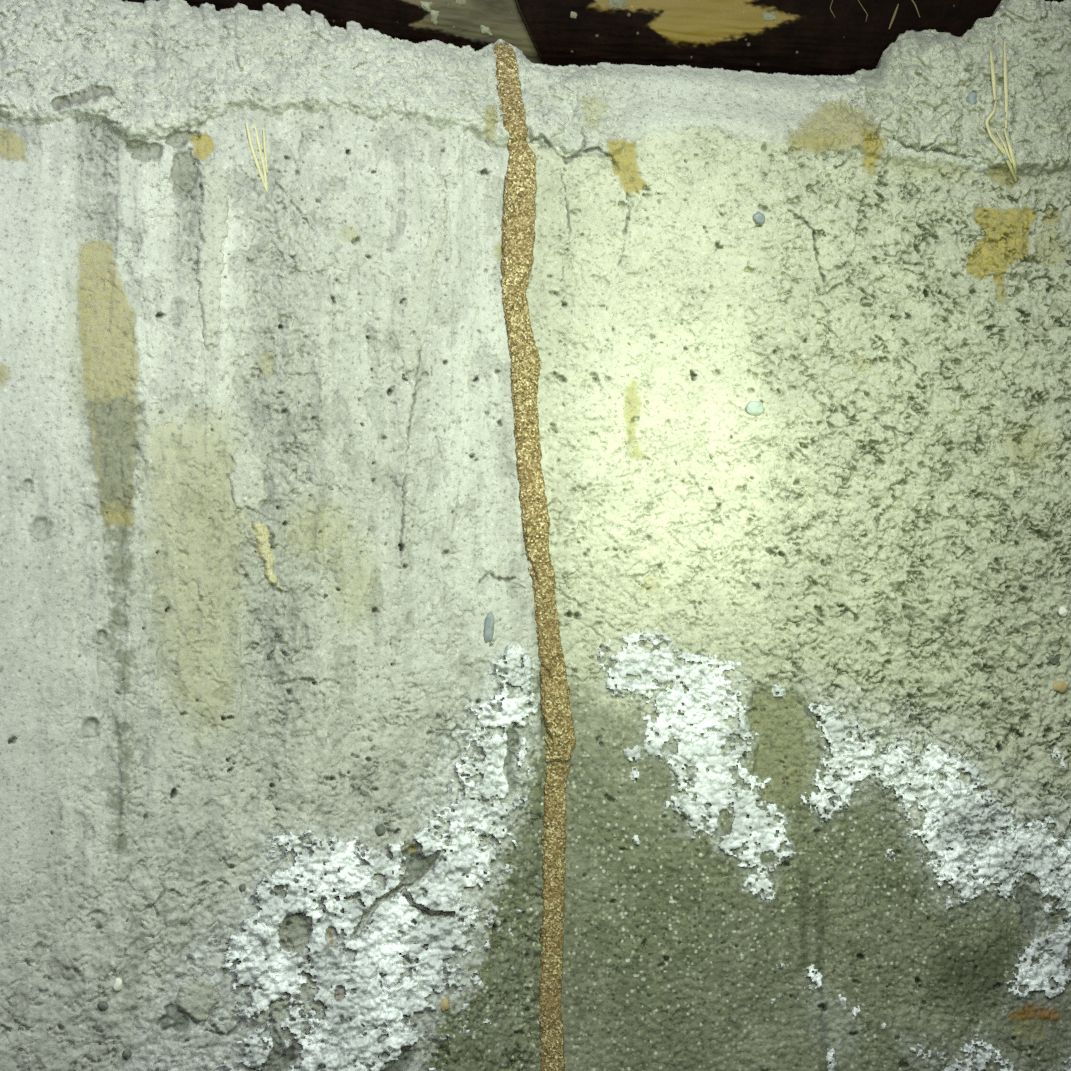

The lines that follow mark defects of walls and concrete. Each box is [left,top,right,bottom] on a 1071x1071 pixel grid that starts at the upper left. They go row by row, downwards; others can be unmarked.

damp [80,243,144,690]
damp [108,774,129,849]
damp [127,644,552,1071]
damp [561,630,1071,1071]